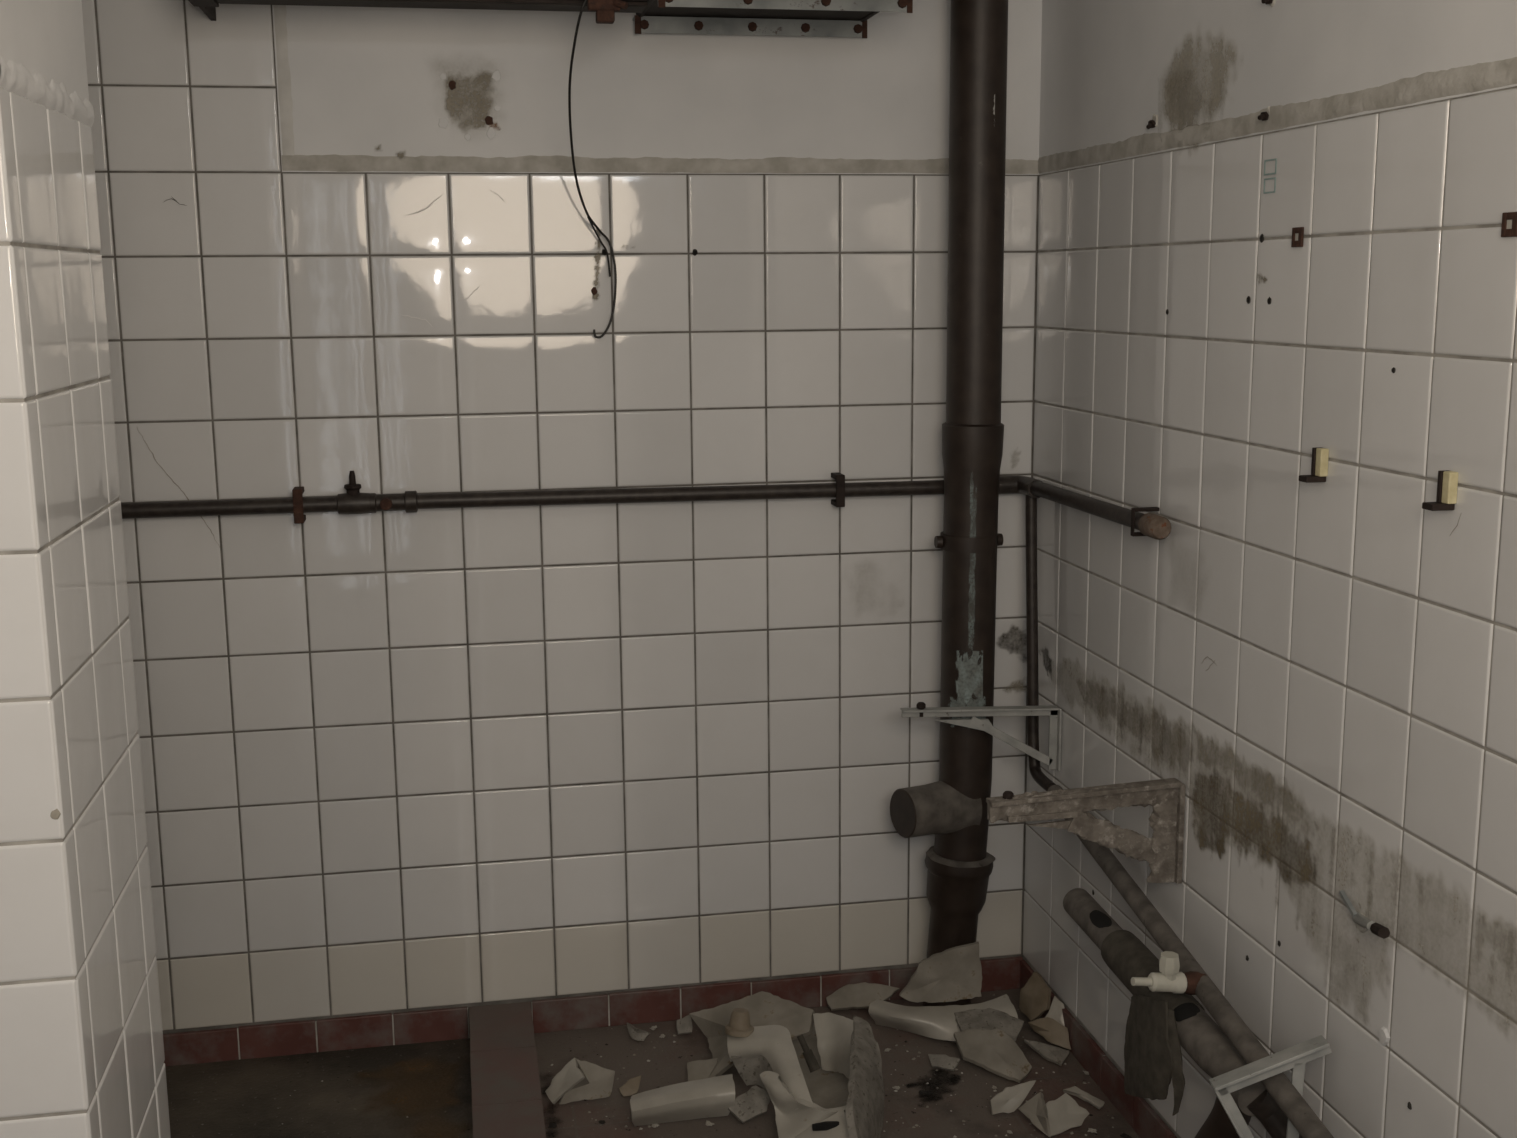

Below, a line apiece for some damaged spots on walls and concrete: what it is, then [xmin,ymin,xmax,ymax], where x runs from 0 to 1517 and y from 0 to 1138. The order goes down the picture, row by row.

peeling [438,70,501,141]
water stain [1165,39,1234,128]
water stain [1193,737,1315,883]